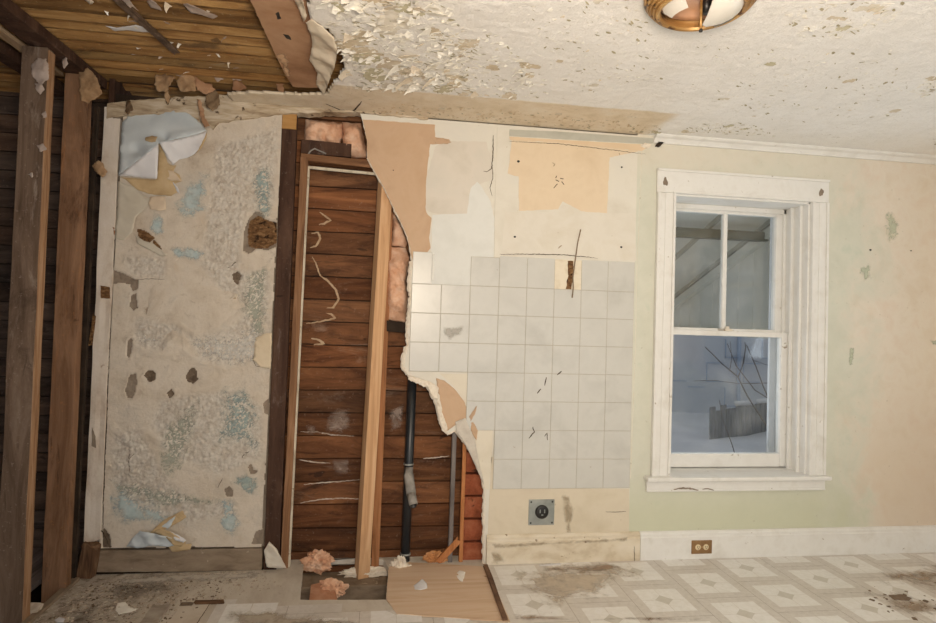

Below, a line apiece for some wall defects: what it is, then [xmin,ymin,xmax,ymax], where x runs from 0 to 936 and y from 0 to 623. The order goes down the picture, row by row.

peeling [105,0,148,32]
peeling [147,0,172,24]
peeling [183,3,218,19]
peeling [785,0,905,39]
peeling [294,0,663,129]
peeling [154,53,246,127]
peeling [678,45,936,137]
peeling [115,181,167,257]
spalling [243,212,278,254]
spalling [113,270,139,311]
flaking render [253,333,272,369]